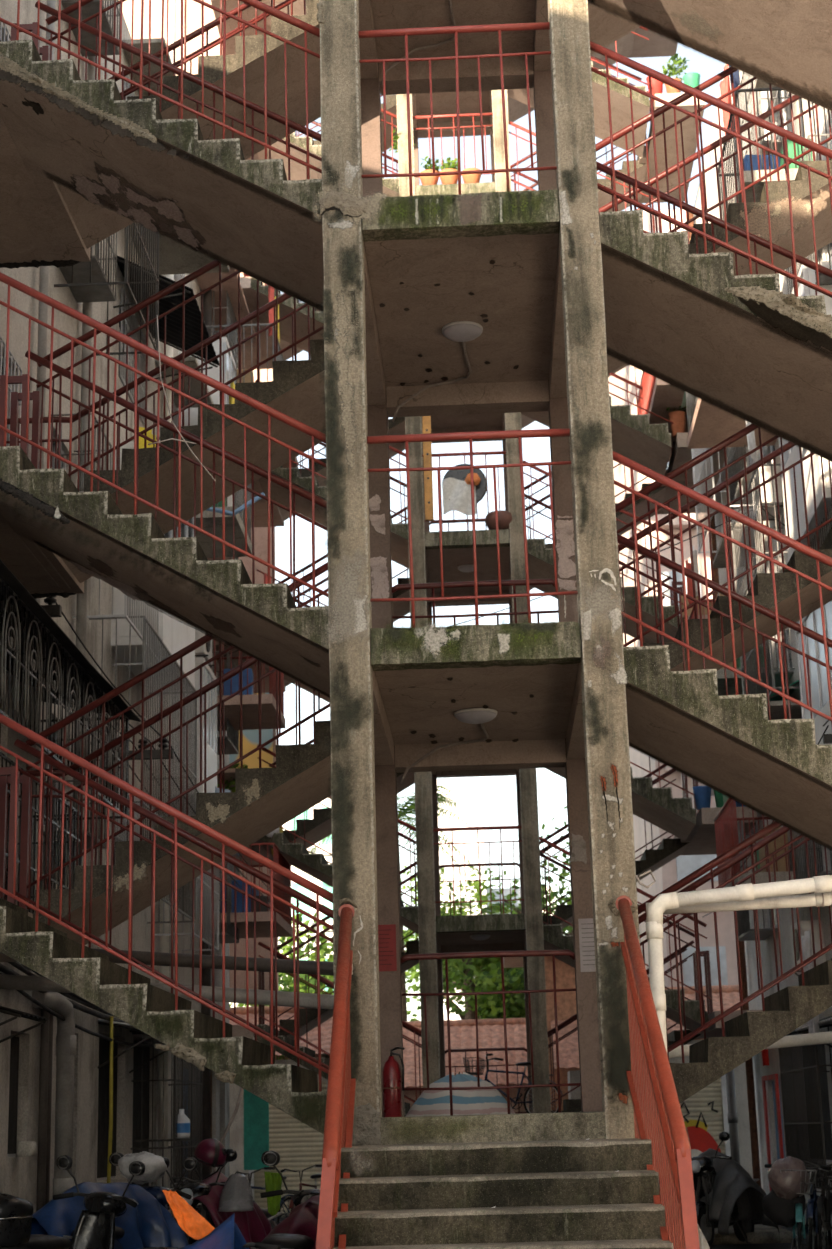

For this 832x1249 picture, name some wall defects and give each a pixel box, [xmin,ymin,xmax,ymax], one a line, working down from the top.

peeling [71,162,206,251]
water stain [157,139,343,224]
water stain [562,168,577,201]
water stain [567,229,575,258]
water stain [602,244,832,359]
spalling [725,286,832,351]
water stain [172,239,362,557]
water stain [607,348,832,461]
peeling [417,624,460,652]
peeling [498,634,510,653]
peeling [609,608,621,632]
peeling [610,654,627,683]